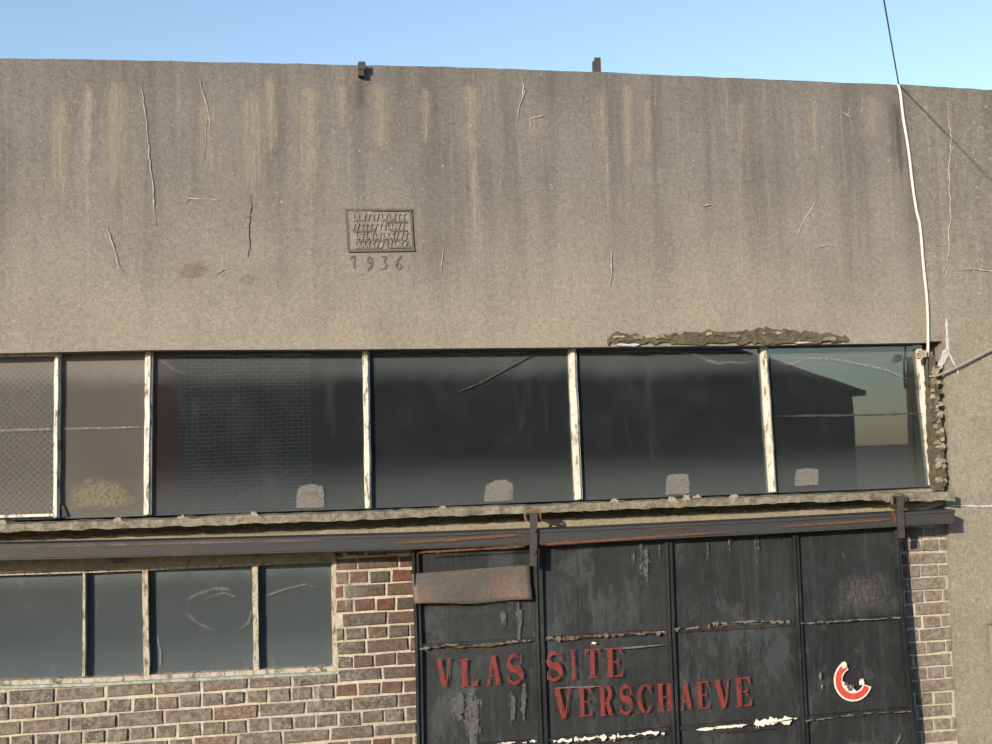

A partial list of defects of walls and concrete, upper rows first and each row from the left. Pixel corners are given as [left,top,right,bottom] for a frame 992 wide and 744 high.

crack [141,80,156,225]
crack [200,83,211,156]
crack [944,108,992,282]
spalling [607,326,849,346]
peeling [916,318,959,483]
peeling [553,731,665,744]